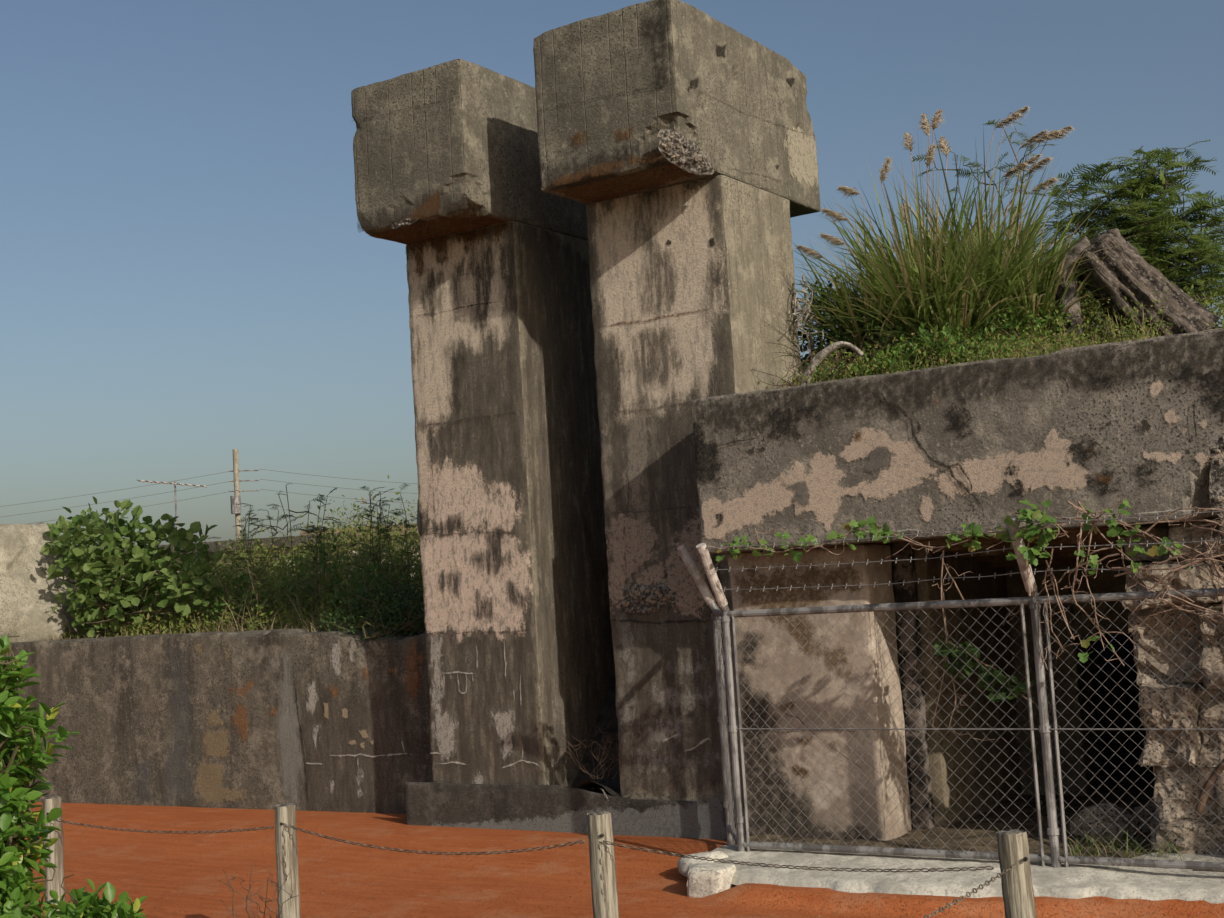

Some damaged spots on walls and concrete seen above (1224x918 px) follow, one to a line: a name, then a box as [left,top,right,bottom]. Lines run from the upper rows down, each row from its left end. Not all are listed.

rust [553,151,695,202]
rust [371,211,513,276]
peeling [407,232,533,642]
damp [271,176,1224,840]
peeling [595,127,1091,619]
crack [874,391,984,516]
peeling [1150,380,1163,397]
spalling [1142,435,1224,518]
peeling [1164,410,1207,433]